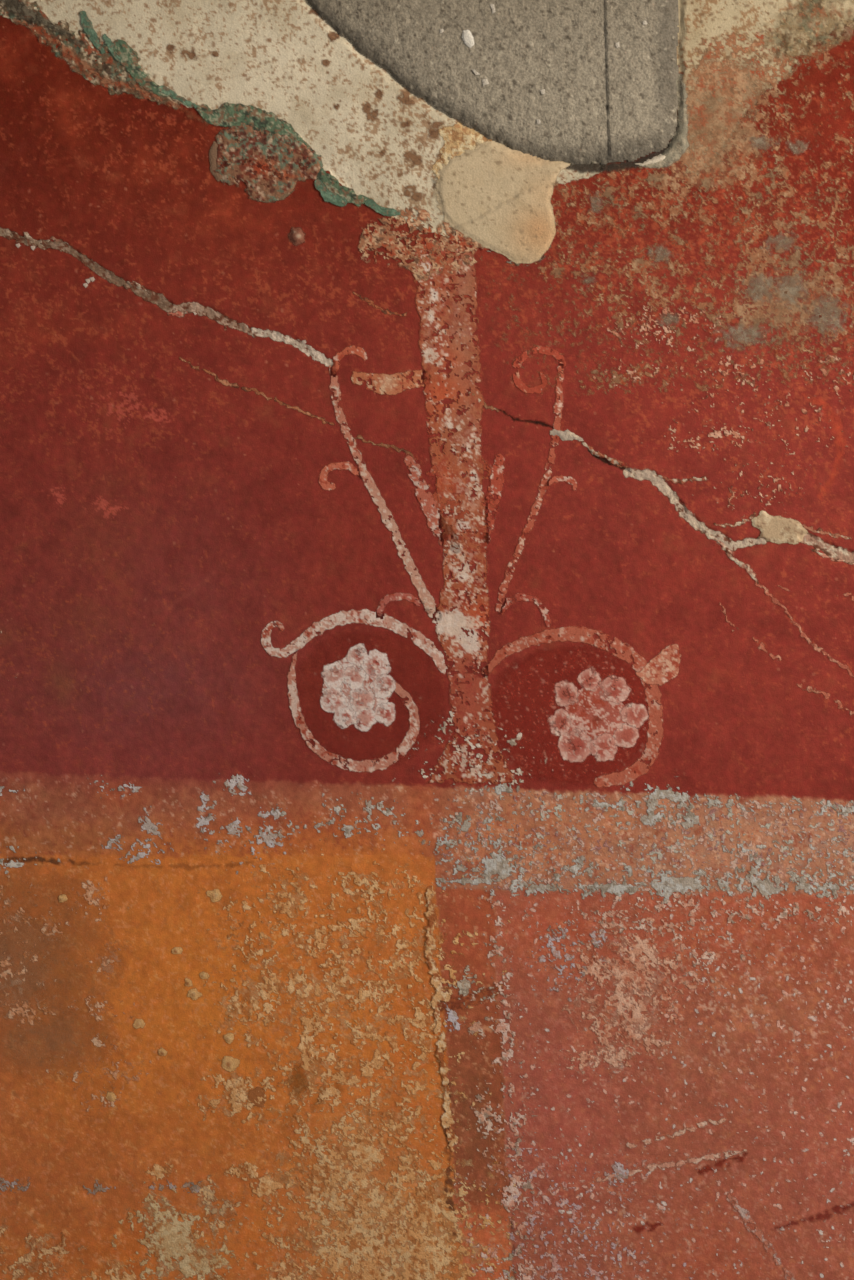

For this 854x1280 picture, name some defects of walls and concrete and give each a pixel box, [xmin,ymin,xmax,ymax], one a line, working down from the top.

crack [0,227,333,367]
flaking render [0,0,504,237]
crack [179,357,414,459]
crack [353,292,407,316]
peeling [507,0,854,395]
crack [468,392,854,715]
peeling [0,839,549,1280]